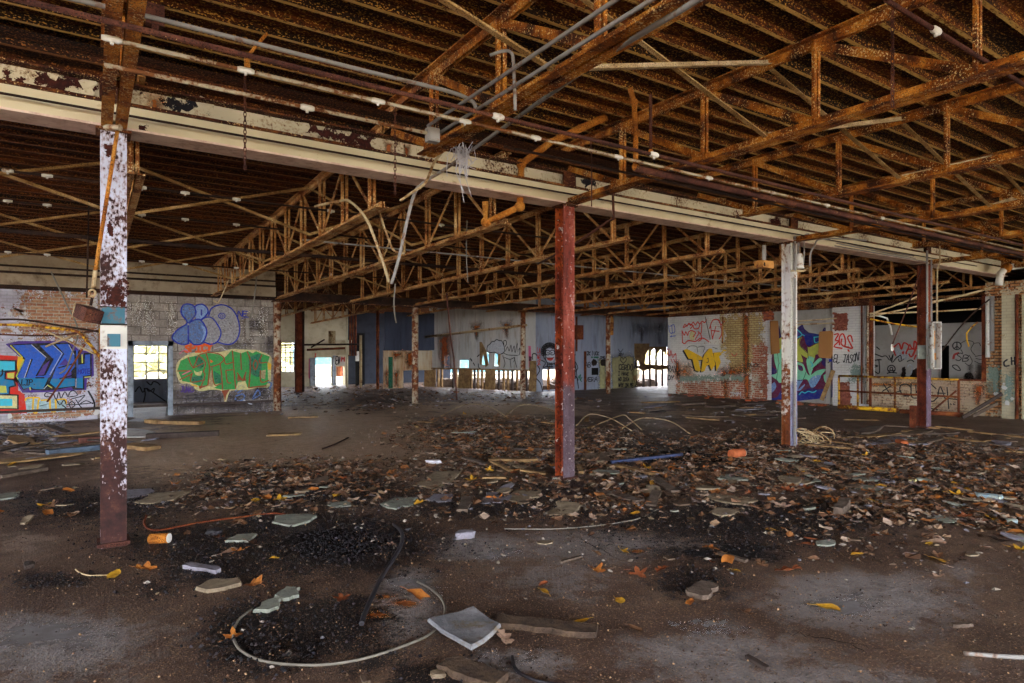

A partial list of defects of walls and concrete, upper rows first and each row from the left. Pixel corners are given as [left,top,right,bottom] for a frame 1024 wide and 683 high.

peeling [2,68,99,96]
peeling [159,96,214,117]
peeling [299,121,381,149]
peeling [0,279,131,423]
peeling [674,308,774,399]